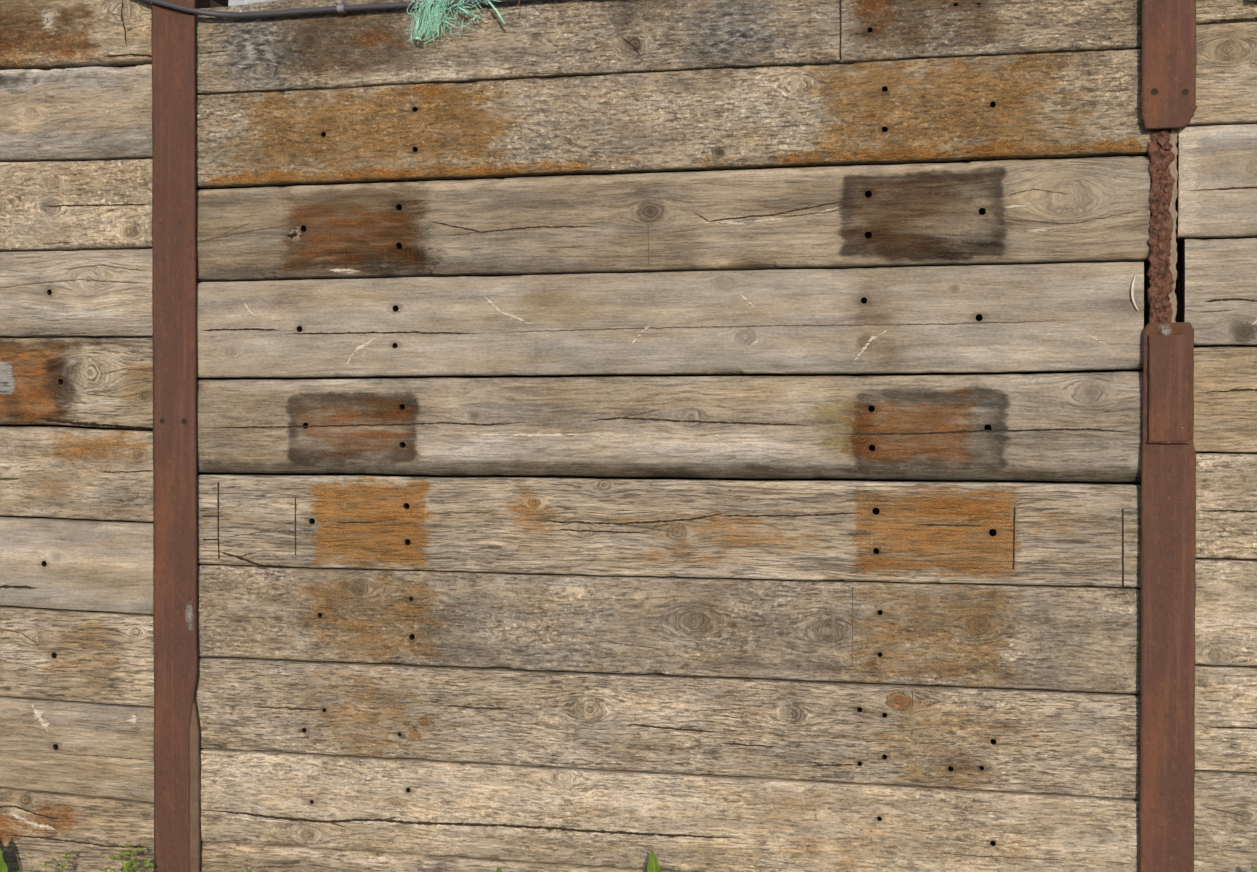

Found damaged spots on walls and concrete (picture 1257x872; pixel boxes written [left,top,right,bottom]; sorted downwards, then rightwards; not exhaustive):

crack [694,200,857,222]
rust [1146,129,1176,323]
rust [0,362,15,394]